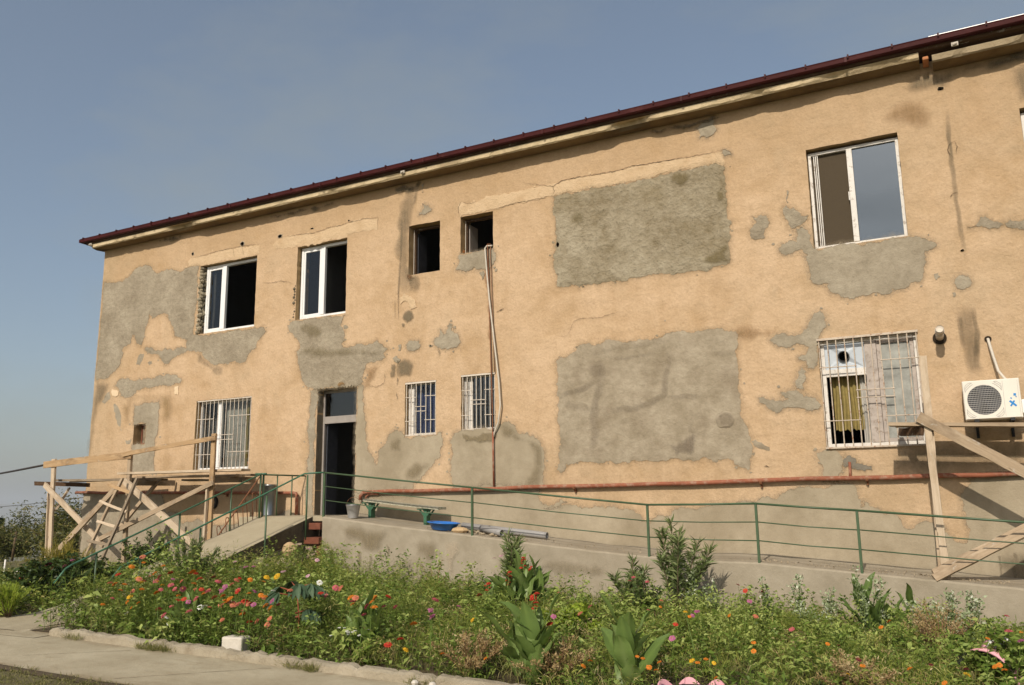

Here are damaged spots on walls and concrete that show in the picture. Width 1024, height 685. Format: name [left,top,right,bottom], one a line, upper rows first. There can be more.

spalling [750,190,940,304]
spalling [95,265,267,446]
spalling [287,285,460,404]
spalling [758,307,830,413]